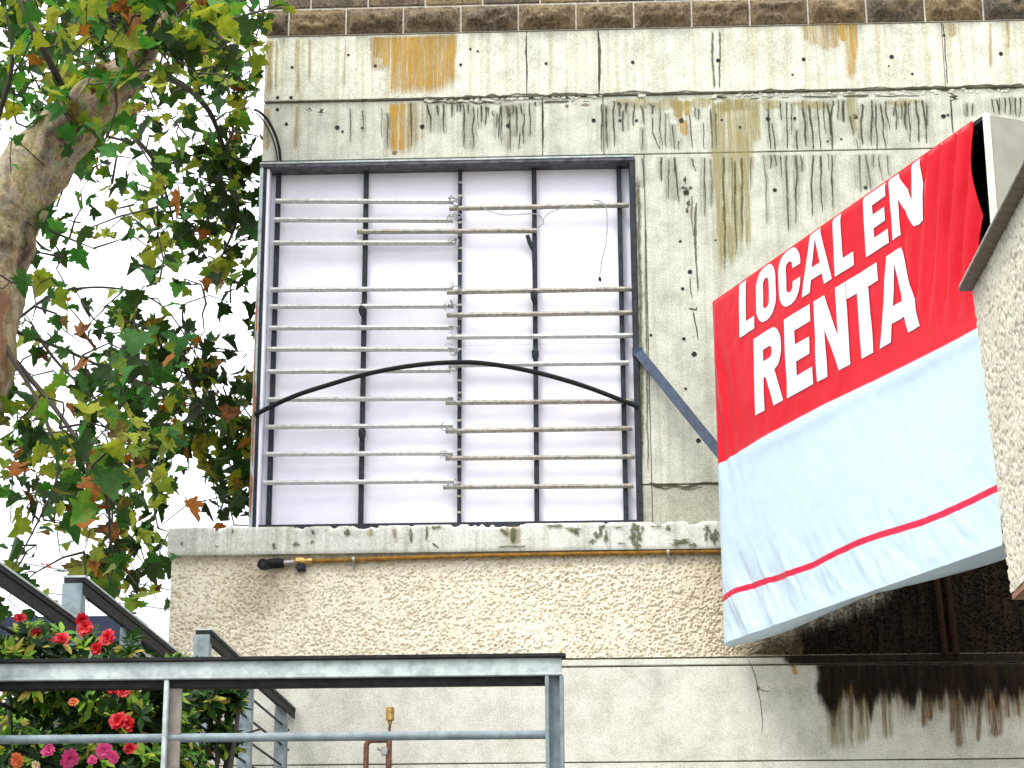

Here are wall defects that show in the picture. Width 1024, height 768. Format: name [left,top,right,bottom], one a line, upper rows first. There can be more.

corrosion [804,24,858,76]
corrosion [370,35,456,155]
damp [426,102,536,149]
corrosion [676,100,689,135]
damp [601,93,928,267]
damp [499,526,525,548]
damp [547,523,719,550]
damp [748,559,1024,746]